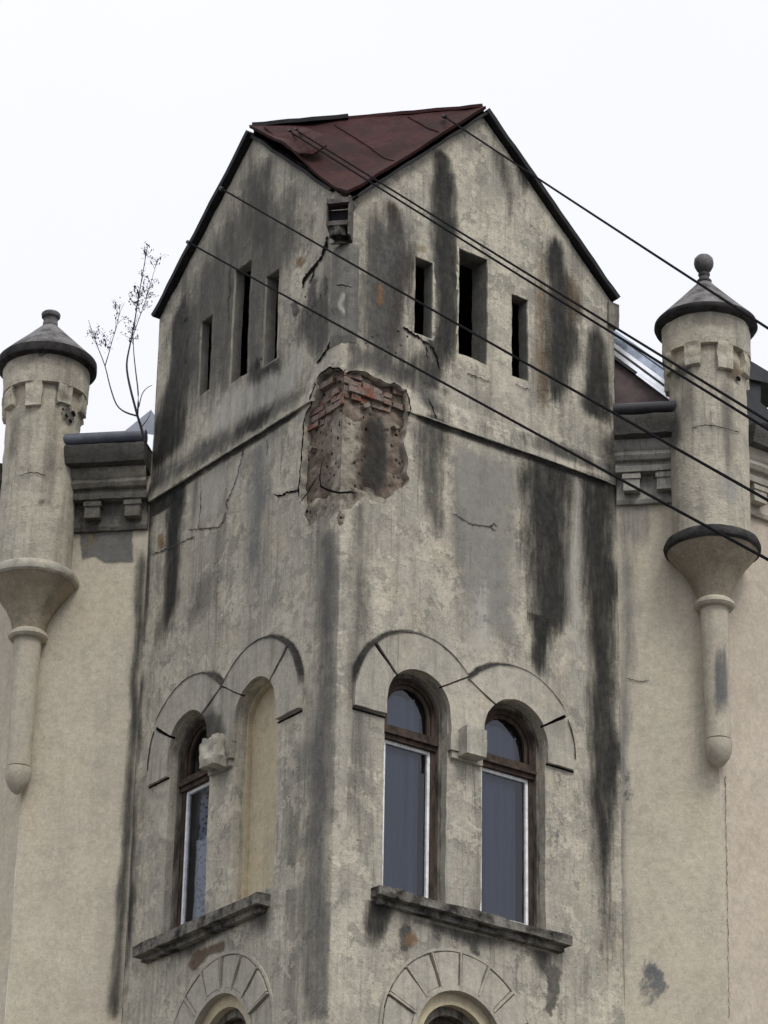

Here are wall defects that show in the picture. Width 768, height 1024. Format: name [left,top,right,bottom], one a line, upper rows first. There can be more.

damp [153,298,188,468]
crack [152,440,268,555]
crack [302,236,328,288]
spalling [297,366,412,526]
damp [409,152,459,389]
crack [453,514,497,531]
damp [544,237,612,421]
damp [110,484,303,1016]
damp [352,458,629,909]